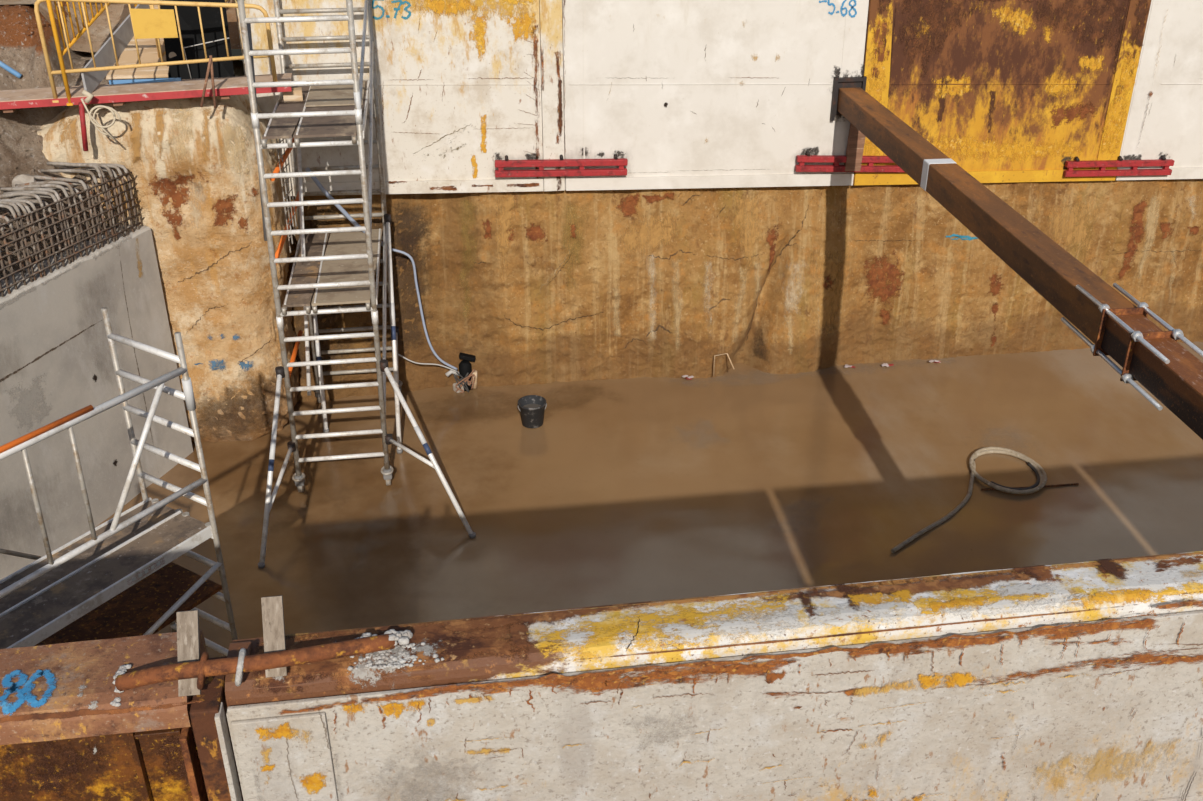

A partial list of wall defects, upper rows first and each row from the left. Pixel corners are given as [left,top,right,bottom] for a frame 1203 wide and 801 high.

peeling [386,0,536,58]
rust [871,0,1004,80]
rust [1024,0,1149,106]
rust [469,1,566,187]
rust [936,78,949,122]
rust [988,91,996,133]
rust [1050,101,1096,128]
rust [1118,201,1147,280]
rust [254,551,1203,734]
peeling [527,571,1203,662]
rust [0,700,203,723]
peeling [1037,740,1180,788]